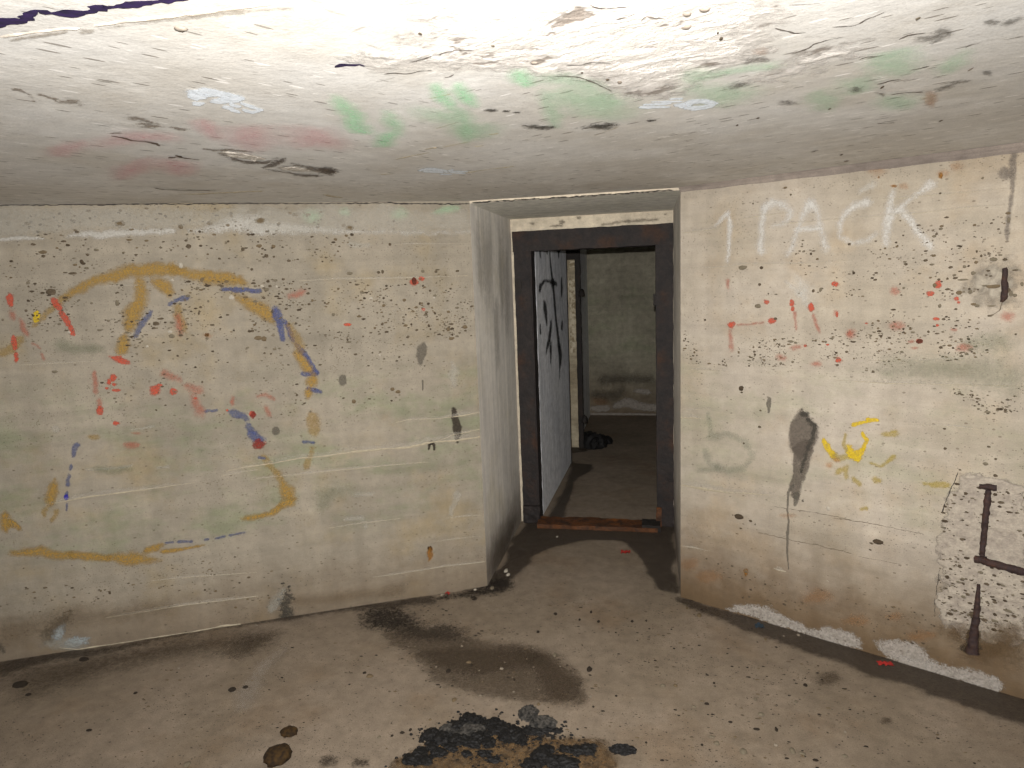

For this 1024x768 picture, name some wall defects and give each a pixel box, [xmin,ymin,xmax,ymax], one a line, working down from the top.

crack [0,0,186,28]
rust [1000,267,1009,303]
water stain [490,447,1024,723]
water stain [786,408,817,569]
spalling [825,446,1024,648]
rust [965,584,981,656]
rust [974,484,1024,576]